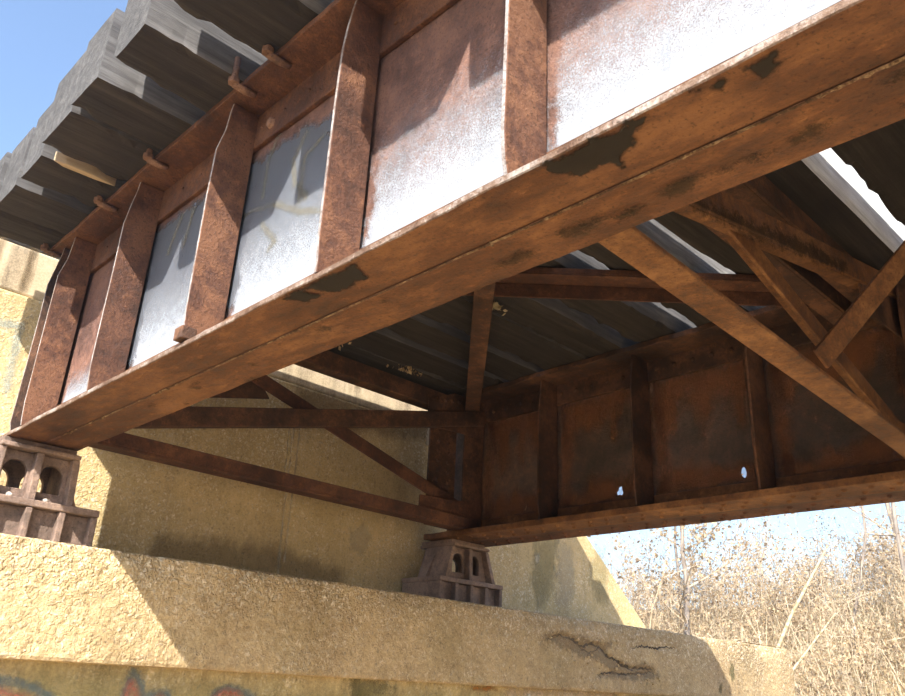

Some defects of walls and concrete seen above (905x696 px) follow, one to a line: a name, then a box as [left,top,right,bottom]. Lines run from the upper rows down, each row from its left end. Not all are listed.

peeling [226,114,333,310]
crack [547,634,674,676]